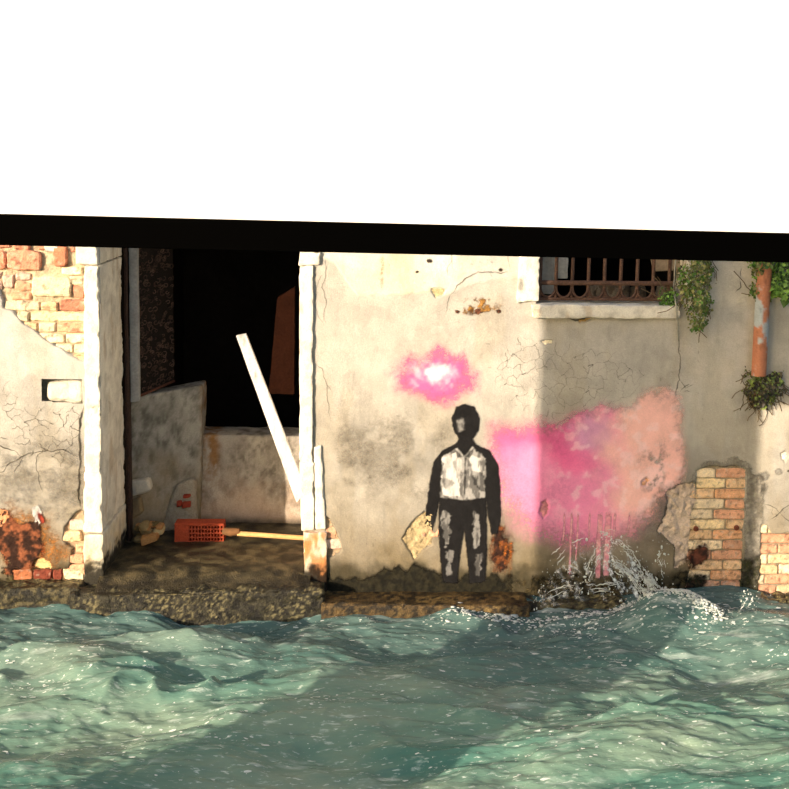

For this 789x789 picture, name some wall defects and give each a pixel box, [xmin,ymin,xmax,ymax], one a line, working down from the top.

spalling [0,245,86,361]
crack [1,411,83,503]
rust [0,508,72,575]
rust [489,525,514,573]
spalling [657,466,745,587]
spalling [758,525,789,594]